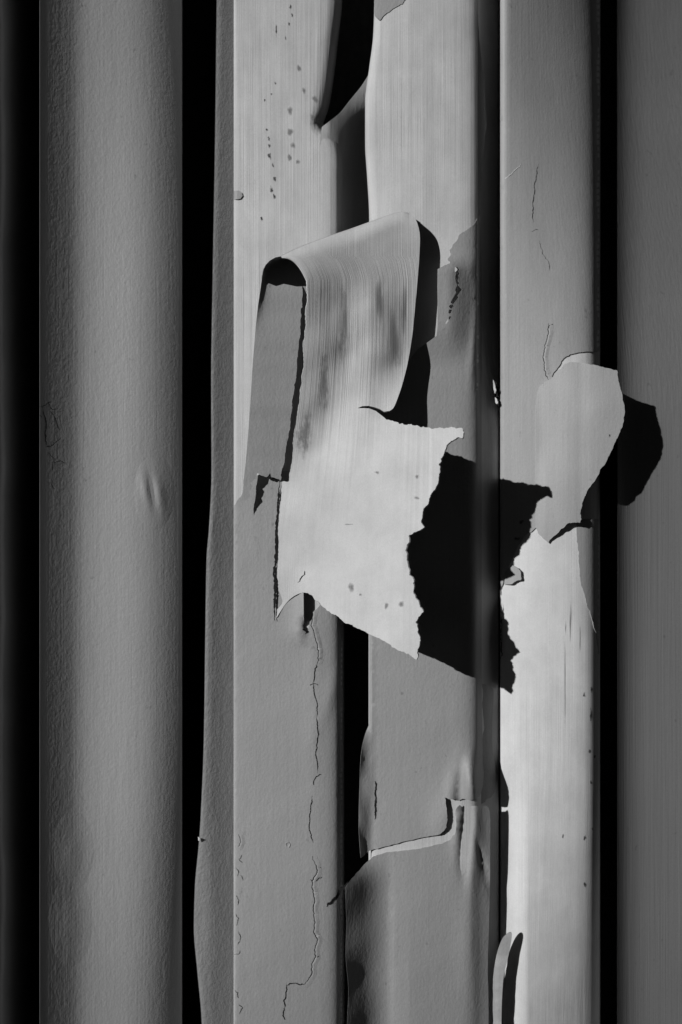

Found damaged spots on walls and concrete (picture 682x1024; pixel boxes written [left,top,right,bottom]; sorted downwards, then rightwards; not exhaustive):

peeling [374,0,405,20]
peeling [240,26,512,1024]
peeling [536,362,625,654]
crack [282,610,348,1020]